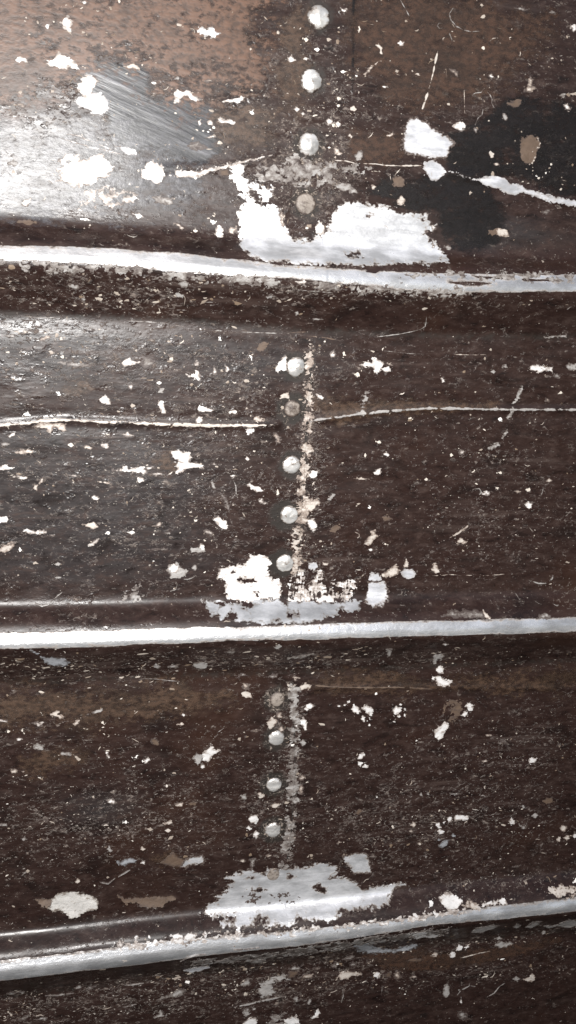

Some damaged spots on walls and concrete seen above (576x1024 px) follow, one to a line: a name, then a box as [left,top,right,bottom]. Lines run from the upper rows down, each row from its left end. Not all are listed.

peeling [19,145,574,301]
peeling [205,554,416,628]
peeling [115,841,508,1024]